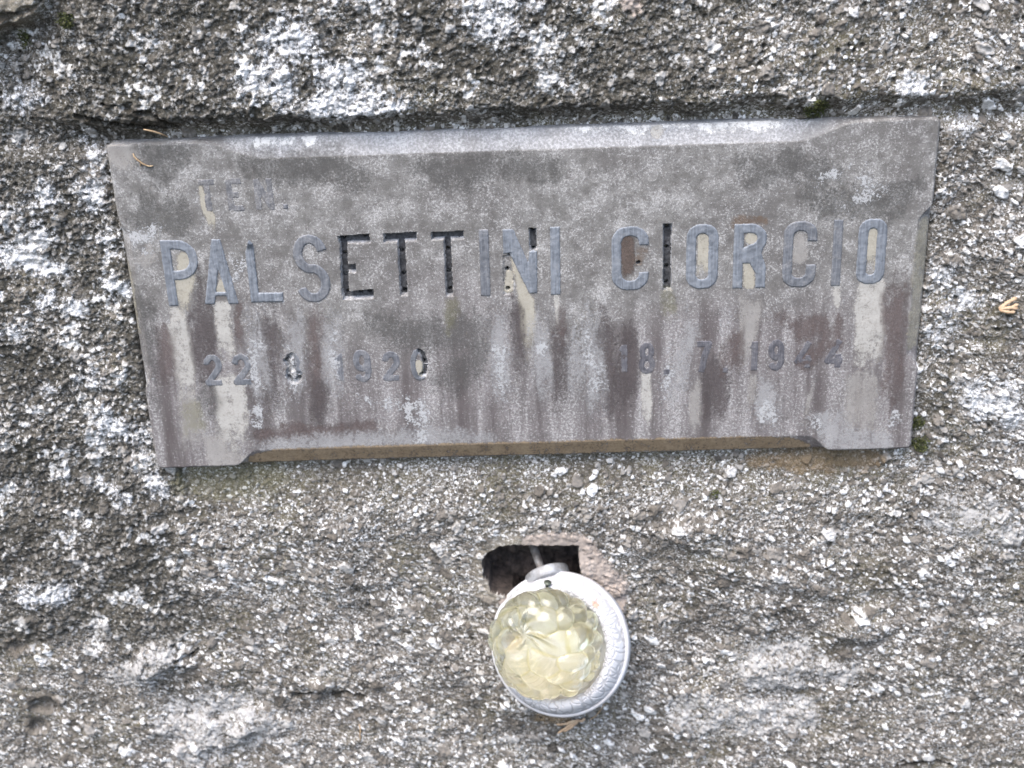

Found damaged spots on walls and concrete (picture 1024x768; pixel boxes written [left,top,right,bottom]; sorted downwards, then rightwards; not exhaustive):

leakage [745,233,757,244]
leakage [160,252,376,466]
leakage [504,258,537,371]
leakage [549,294,569,398]
leakage [594,307,653,422]
leakage [689,263,760,424]
leakage [775,228,910,429]
spalling [482,545,581,597]